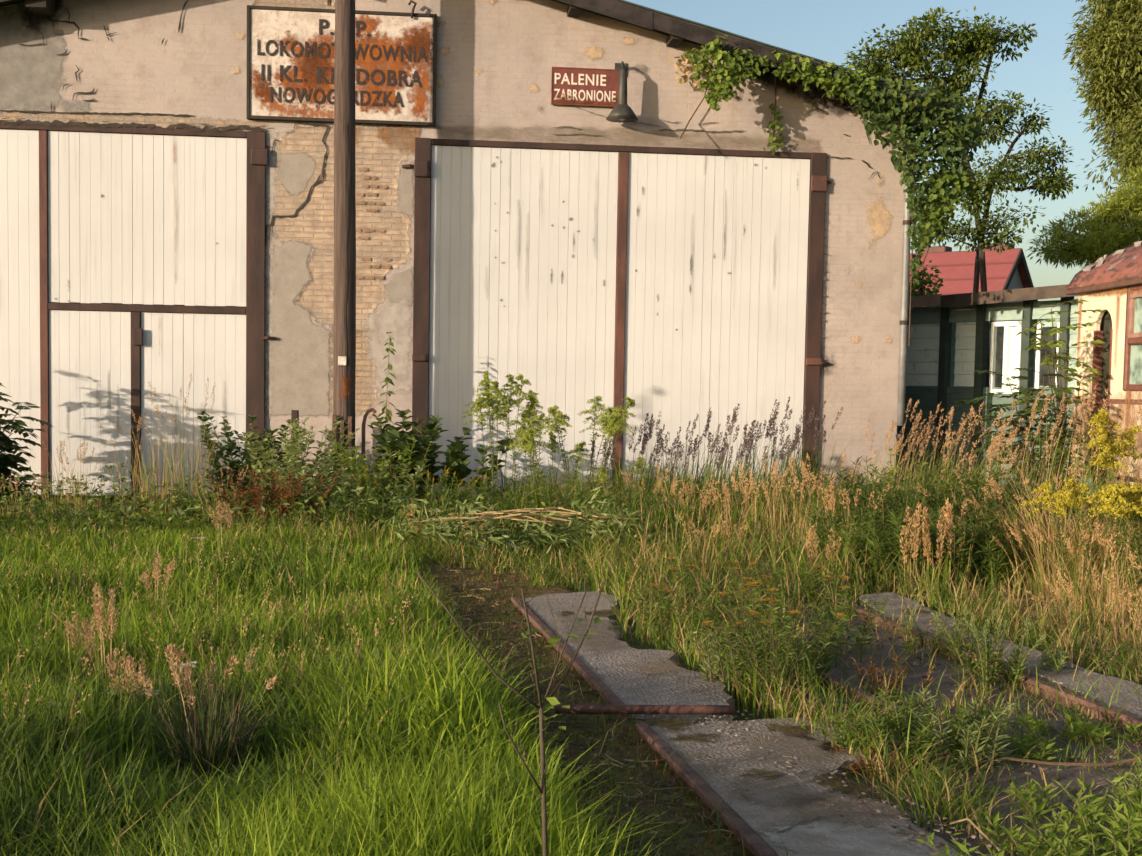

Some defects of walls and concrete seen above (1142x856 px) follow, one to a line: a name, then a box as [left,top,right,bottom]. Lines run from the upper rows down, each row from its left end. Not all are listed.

crack [0,9,195,117]
crack [162,0,188,44]
flaking render [266,125,334,411]
crack [265,122,349,435]
flaking render [355,124,420,417]